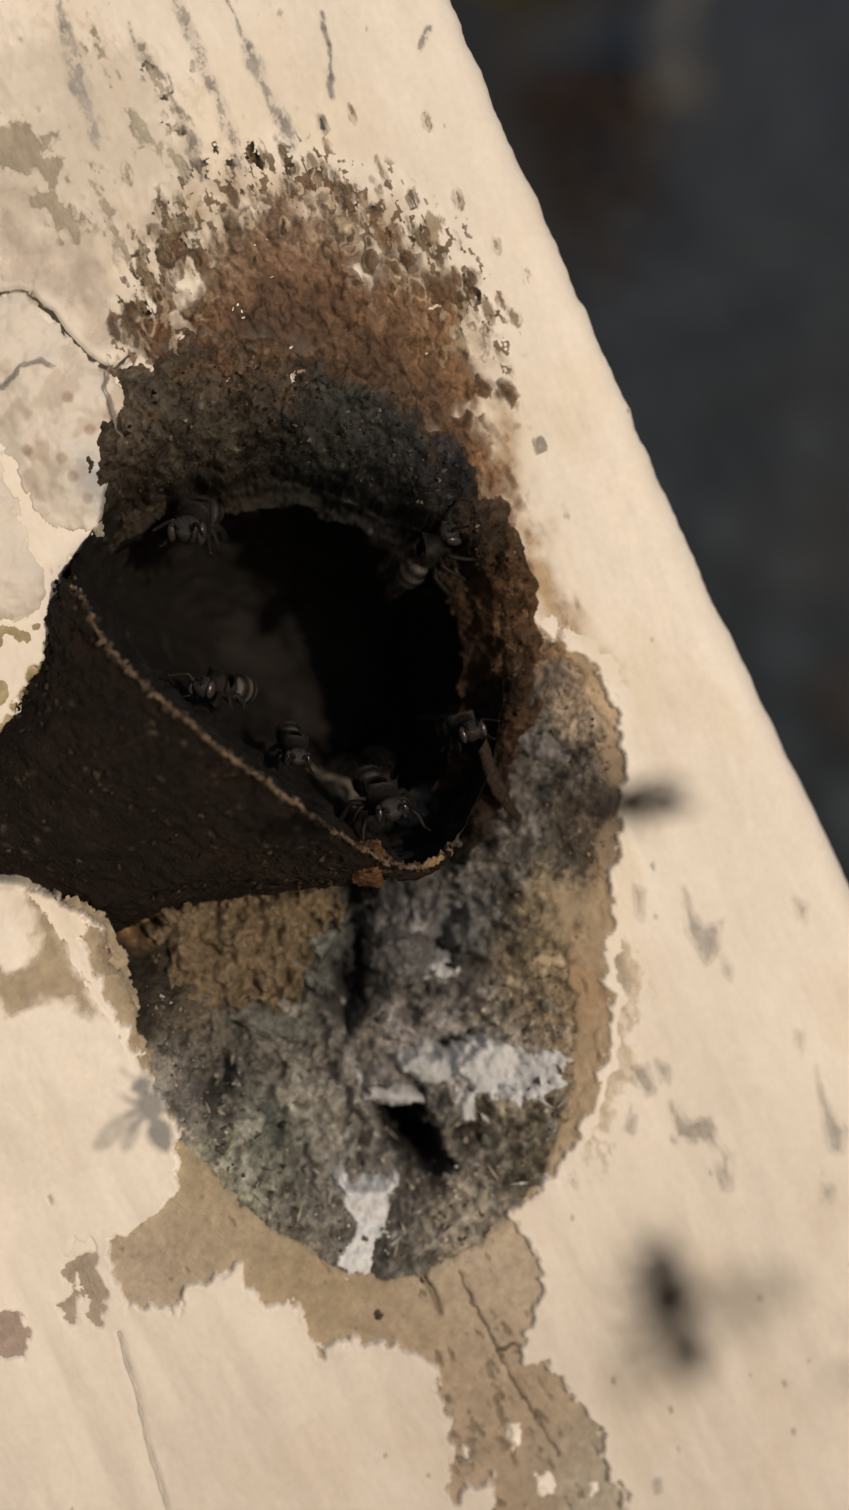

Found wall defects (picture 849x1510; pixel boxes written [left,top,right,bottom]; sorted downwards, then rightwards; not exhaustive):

peeling [0,121,133,265]
damp [108,0,519,528]
crack [0,289,131,444]
damp [523,609,566,675]
spalling [56,634,628,1510]
peeling [0,1310,31,1358]